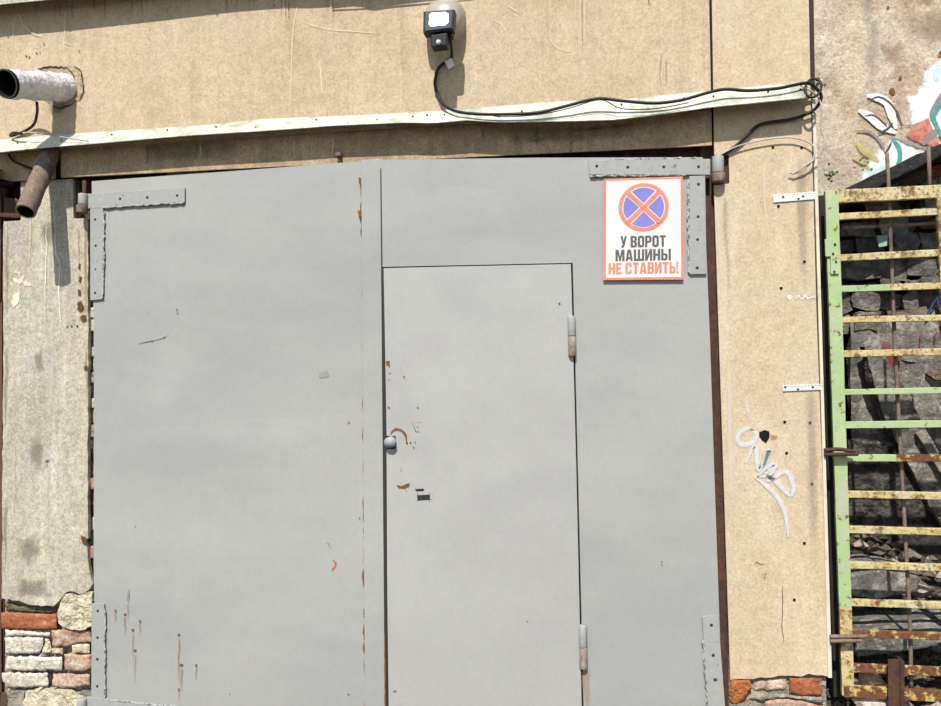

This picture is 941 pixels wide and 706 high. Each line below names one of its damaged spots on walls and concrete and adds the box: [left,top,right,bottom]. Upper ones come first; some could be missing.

spalling [1,589,94,706]
spalling [729,677,823,706]